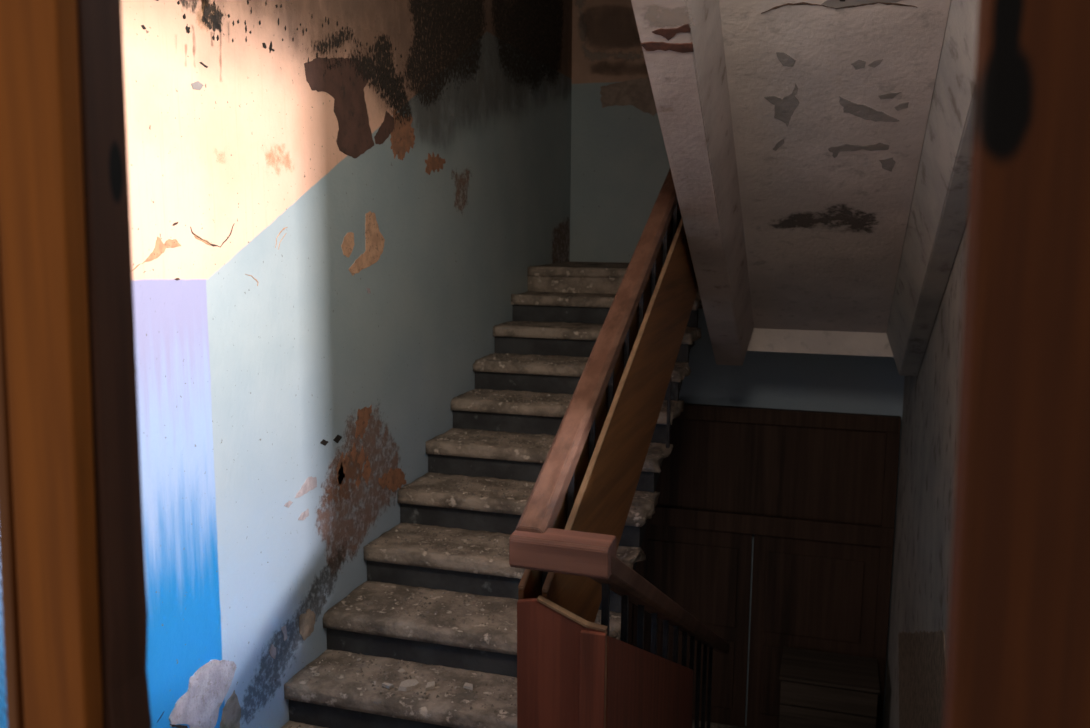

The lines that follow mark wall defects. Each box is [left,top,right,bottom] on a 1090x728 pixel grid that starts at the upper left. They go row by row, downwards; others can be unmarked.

damp [177,0,261,43]
peeling [821,0,902,9]
flaking render [304,57,415,160]
peeling [132,237,181,271]
peeling [341,211,385,276]
flaking render [169,659,241,728]